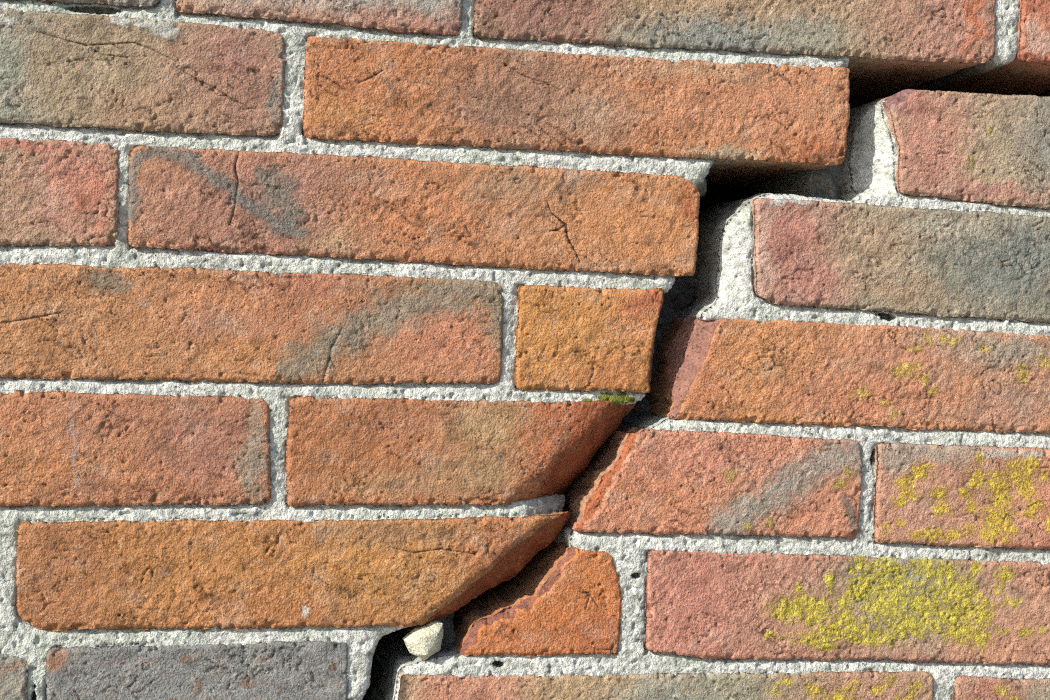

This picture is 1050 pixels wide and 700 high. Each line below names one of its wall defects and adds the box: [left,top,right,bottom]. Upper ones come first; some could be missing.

crack [849,94,894,109]
crack [699,158,845,210]
crack [546,201,580,262]
crack [618,238,700,427]
crack [390,547,476,555]
crack [400,612,456,646]